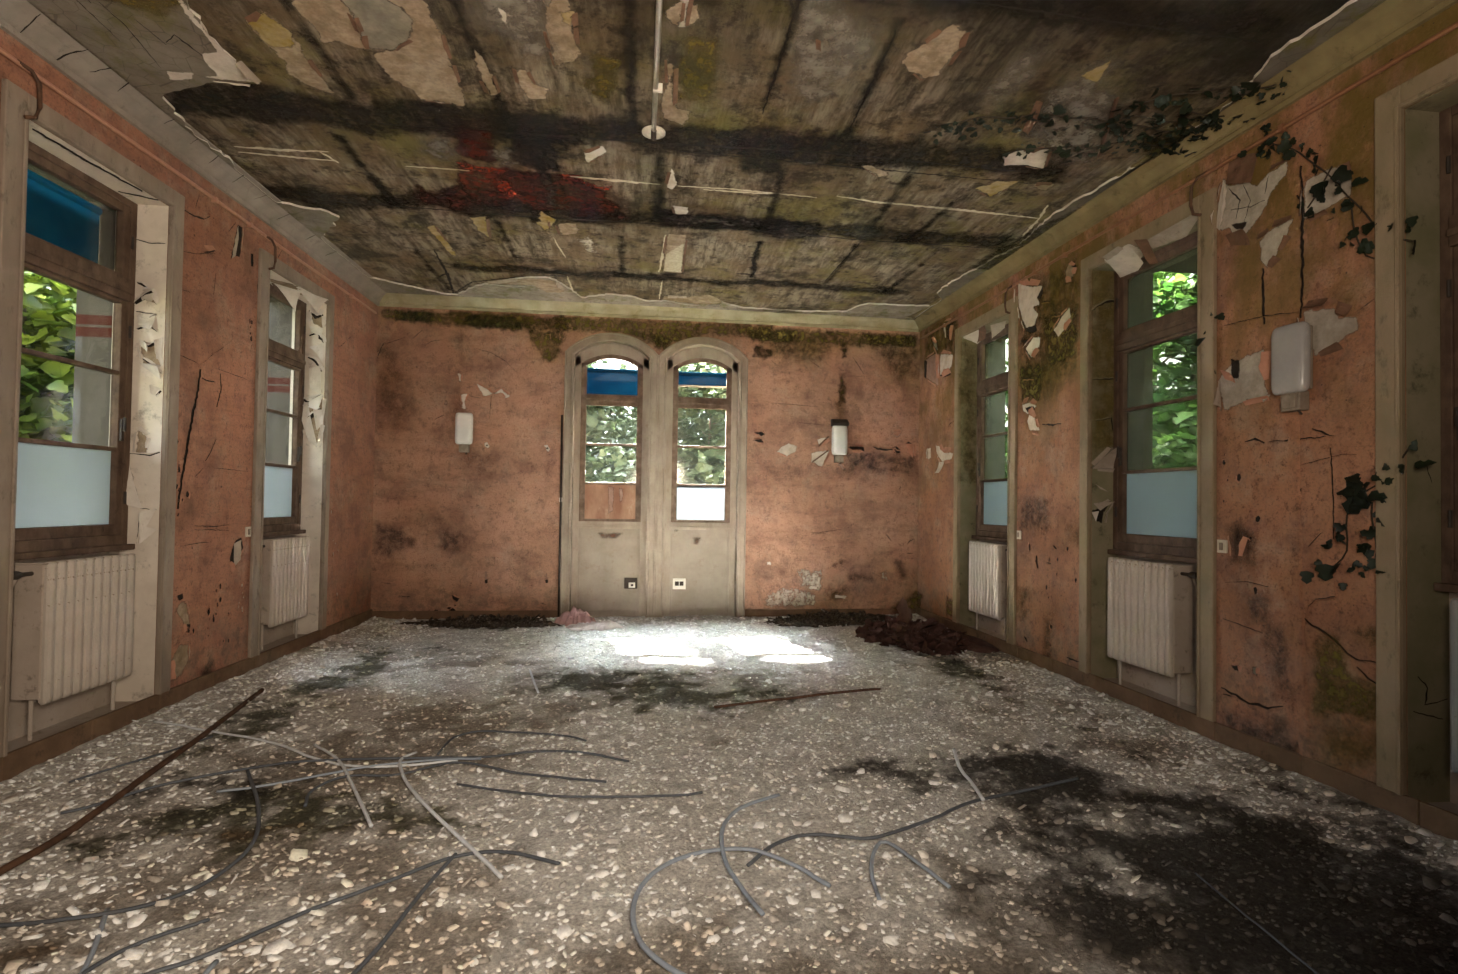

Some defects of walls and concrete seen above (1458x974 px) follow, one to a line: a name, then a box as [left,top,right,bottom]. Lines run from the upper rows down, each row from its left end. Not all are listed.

crack [56,0,203,92]
crack [762,5,799,114]
flaking render [1220,0,1386,112]
flaking render [27,0,1153,319]
damp [168,0,1284,295]
peeling [1102,153,1352,282]
crack [32,119,661,546]
damp [381,308,975,479]
crack [873,445,901,453]
peeling [924,276,1072,387]
damp [1020,269,1114,448]
peeling [1213,350,1271,411]